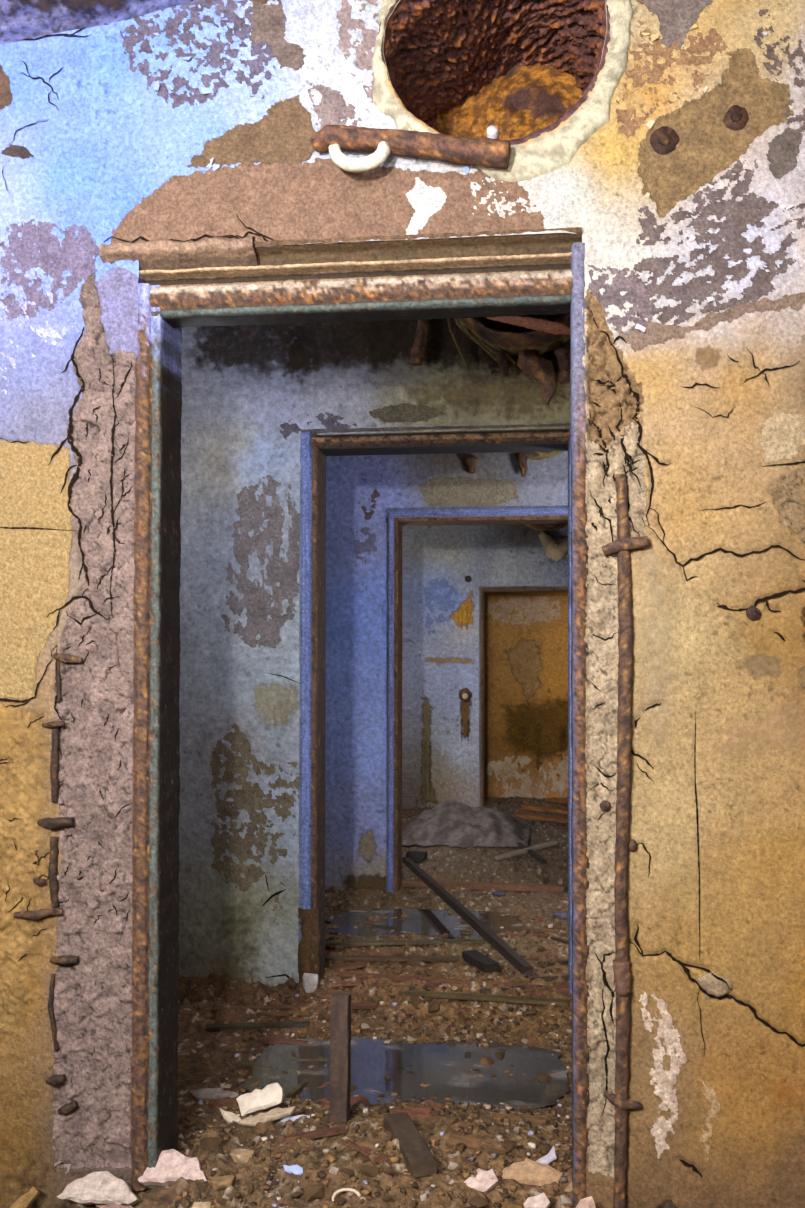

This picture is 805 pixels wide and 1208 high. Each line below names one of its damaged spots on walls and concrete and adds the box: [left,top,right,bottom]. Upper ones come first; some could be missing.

crack [0,327,134,816]
crack [5,818,130,961]
spalling [0,0,561,1174]
water stain [486,699,568,799]
water stain [639,992,687,1159]
spalling [584,0,805,1178]
crack [588,307,805,641]
crack [594,724,805,1116]
water stain [699,1079,721,1160]